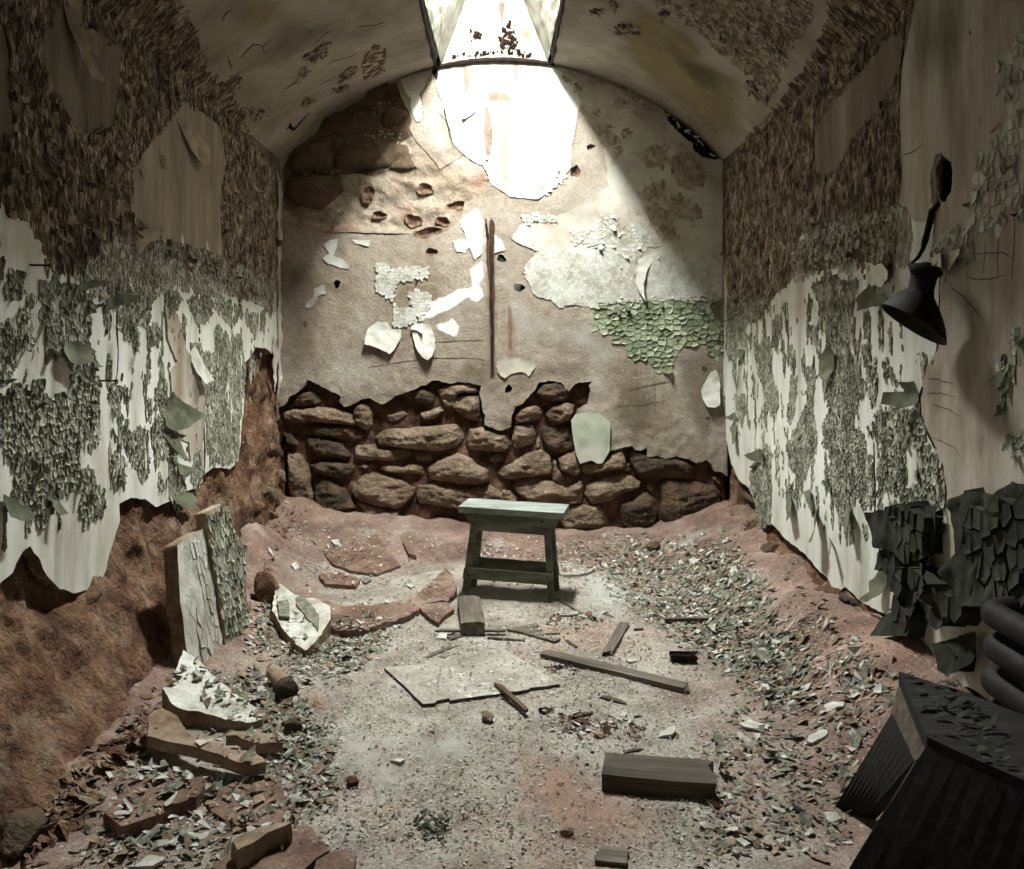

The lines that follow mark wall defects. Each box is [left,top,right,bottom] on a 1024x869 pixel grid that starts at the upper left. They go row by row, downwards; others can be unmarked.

peeling [0,0,725,552]
peeling [572,0,1024,565]
peeling [189,502,250,663]
peeling [859,571,887,602]